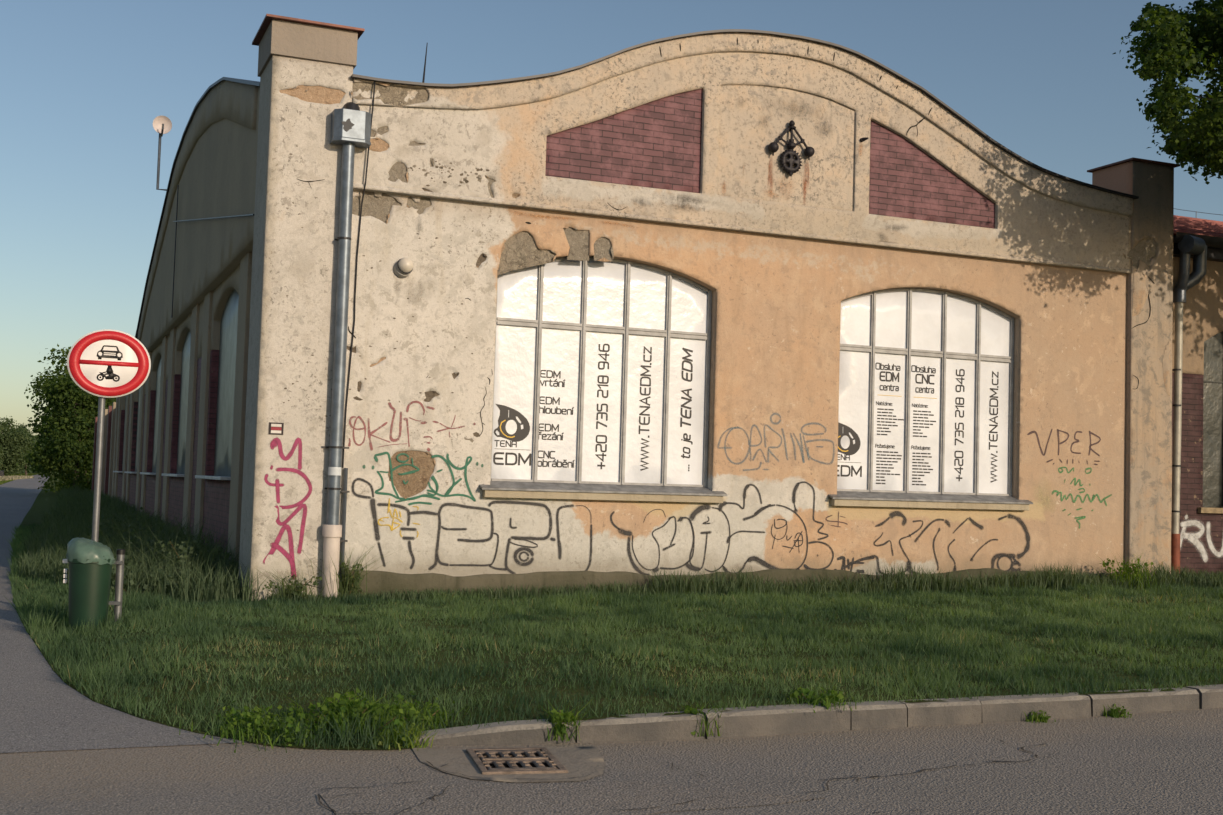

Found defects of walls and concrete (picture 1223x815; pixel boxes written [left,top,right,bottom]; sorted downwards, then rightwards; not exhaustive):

flaking render [279,82,429,107]
peeling [369,126,390,152]
flaking render [352,141,496,224]
flaking render [476,226,614,275]
crack [318,761,475,815]